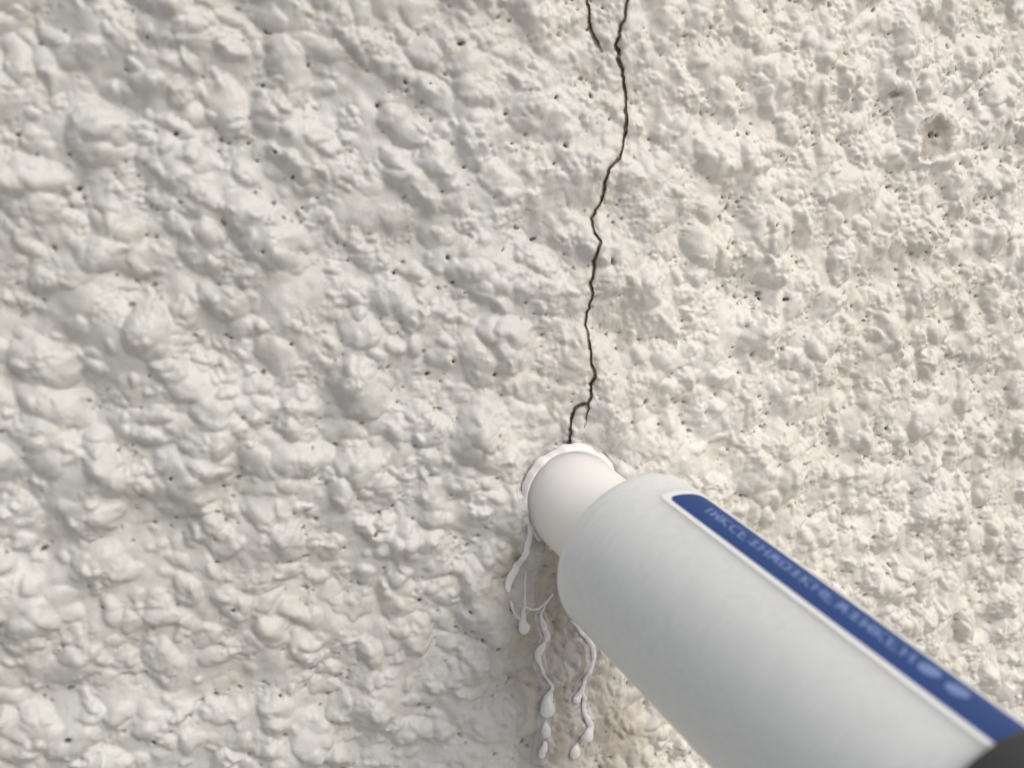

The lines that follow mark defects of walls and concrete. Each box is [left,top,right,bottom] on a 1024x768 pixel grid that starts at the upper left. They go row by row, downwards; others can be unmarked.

crack [568,0,629,444]